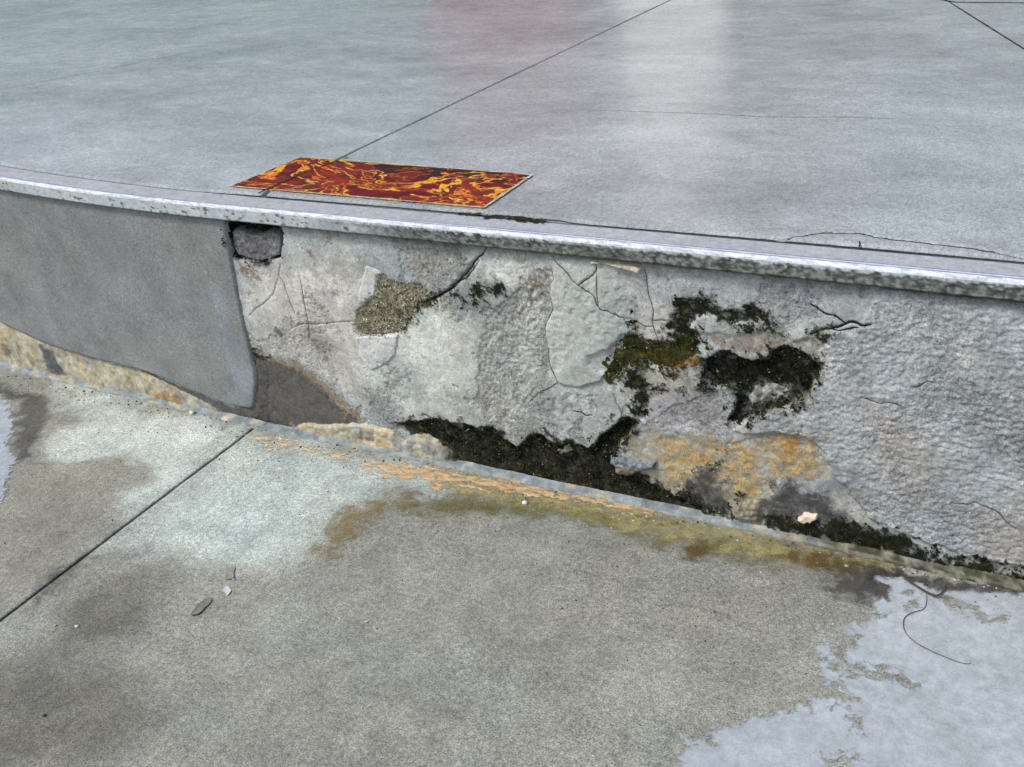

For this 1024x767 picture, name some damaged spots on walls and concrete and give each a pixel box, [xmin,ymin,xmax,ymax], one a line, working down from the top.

spalling [220,221,284,267]
crack [250,266,349,335]
crack [431,247,487,300]
crack [554,260,667,339]
crack [810,303,871,334]
crack [777,232,1022,259]
spalling [675,327,828,431]
spalling [397,409,710,514]
leakage [141,356,1022,603]
corrosion [629,424,835,521]
spalling [798,511,818,524]